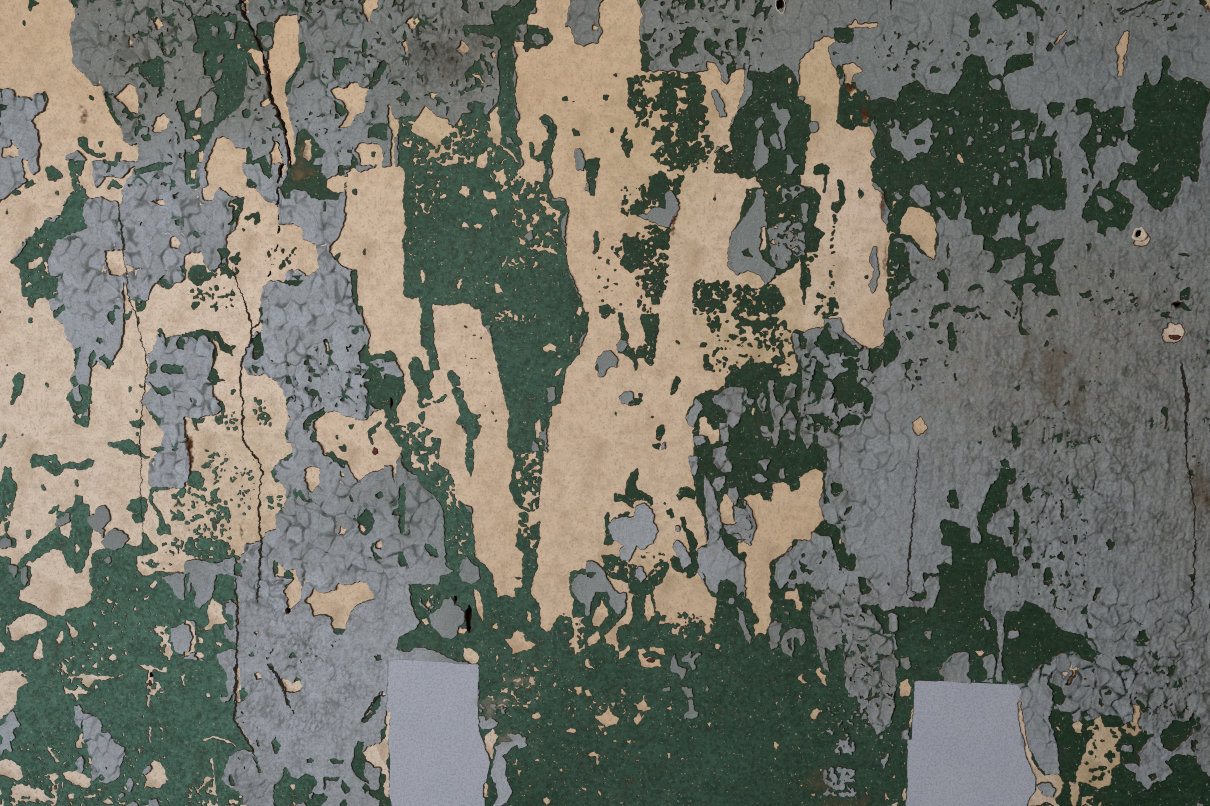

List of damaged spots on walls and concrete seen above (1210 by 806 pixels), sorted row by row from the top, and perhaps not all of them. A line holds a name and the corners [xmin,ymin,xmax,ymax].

peeling [992,0,1061,21]
peeling [1047,56,1210,236]
peeling [917,300,991,330]
flaking render [1156,249,1191,343]
crack [118,205,149,557]
peeling [978,353,1106,457]
peeling [335,484,410,564]
crack [1180,362,1197,609]
flaking render [253,561,375,647]
peeling [1032,543,1065,610]
flaking render [274,691,392,806]
peeling [1150,674,1201,751]